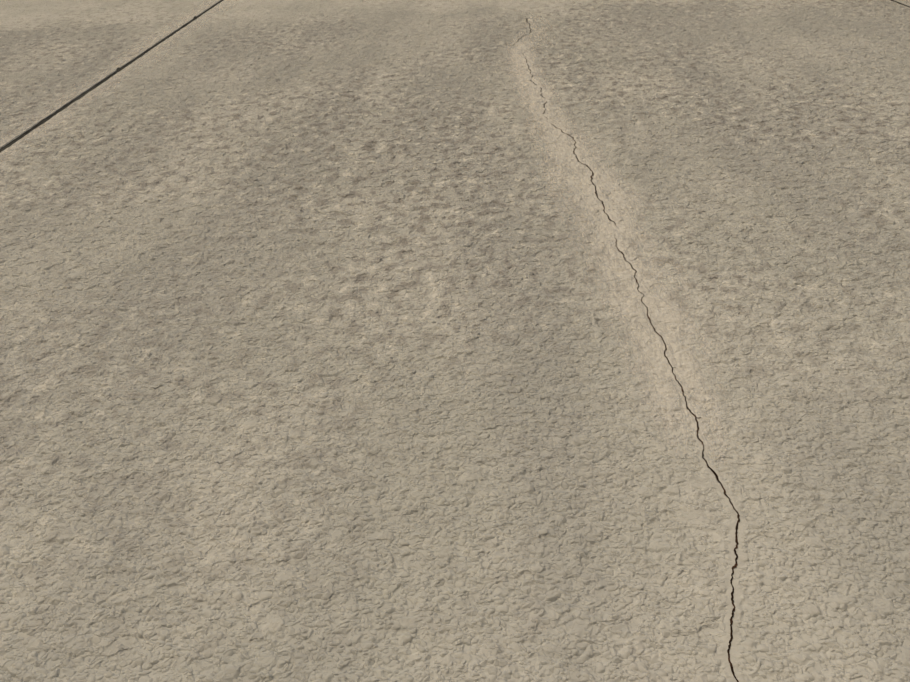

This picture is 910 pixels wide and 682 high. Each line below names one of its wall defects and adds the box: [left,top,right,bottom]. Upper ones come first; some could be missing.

crack [509,17,740,682]